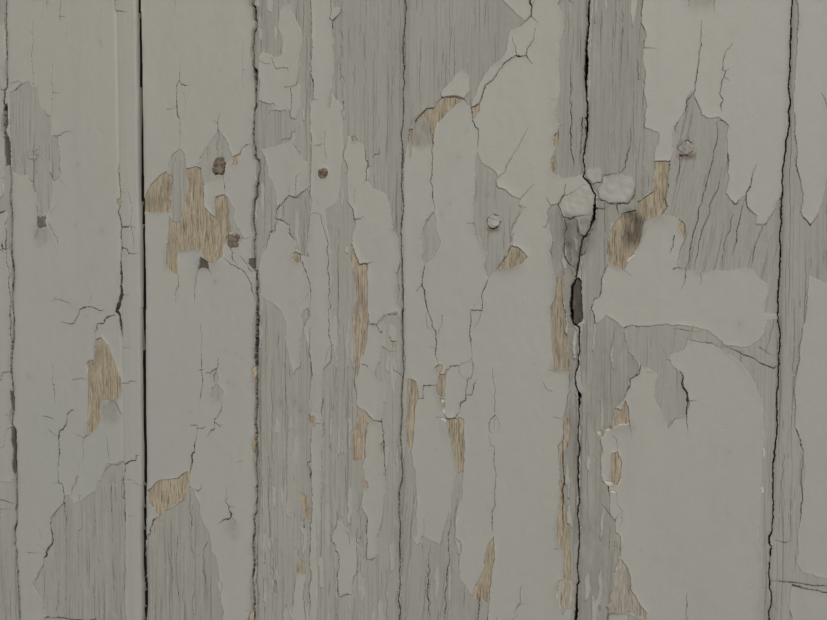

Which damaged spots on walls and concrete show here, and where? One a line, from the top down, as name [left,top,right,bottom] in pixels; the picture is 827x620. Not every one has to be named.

peeling [0,0,16,352]
peeling [32,462,127,620]
crack [27,364,157,620]
crack [52,168,136,349]
peeling [86,337,123,436]
crack [168,0,500,620]
peeling [144,0,529,620]
crack [415,0,537,141]
crack [543,370,571,550]
crack [511,0,657,270]
crack [662,348,698,430]
peeling [549,0,827,620]